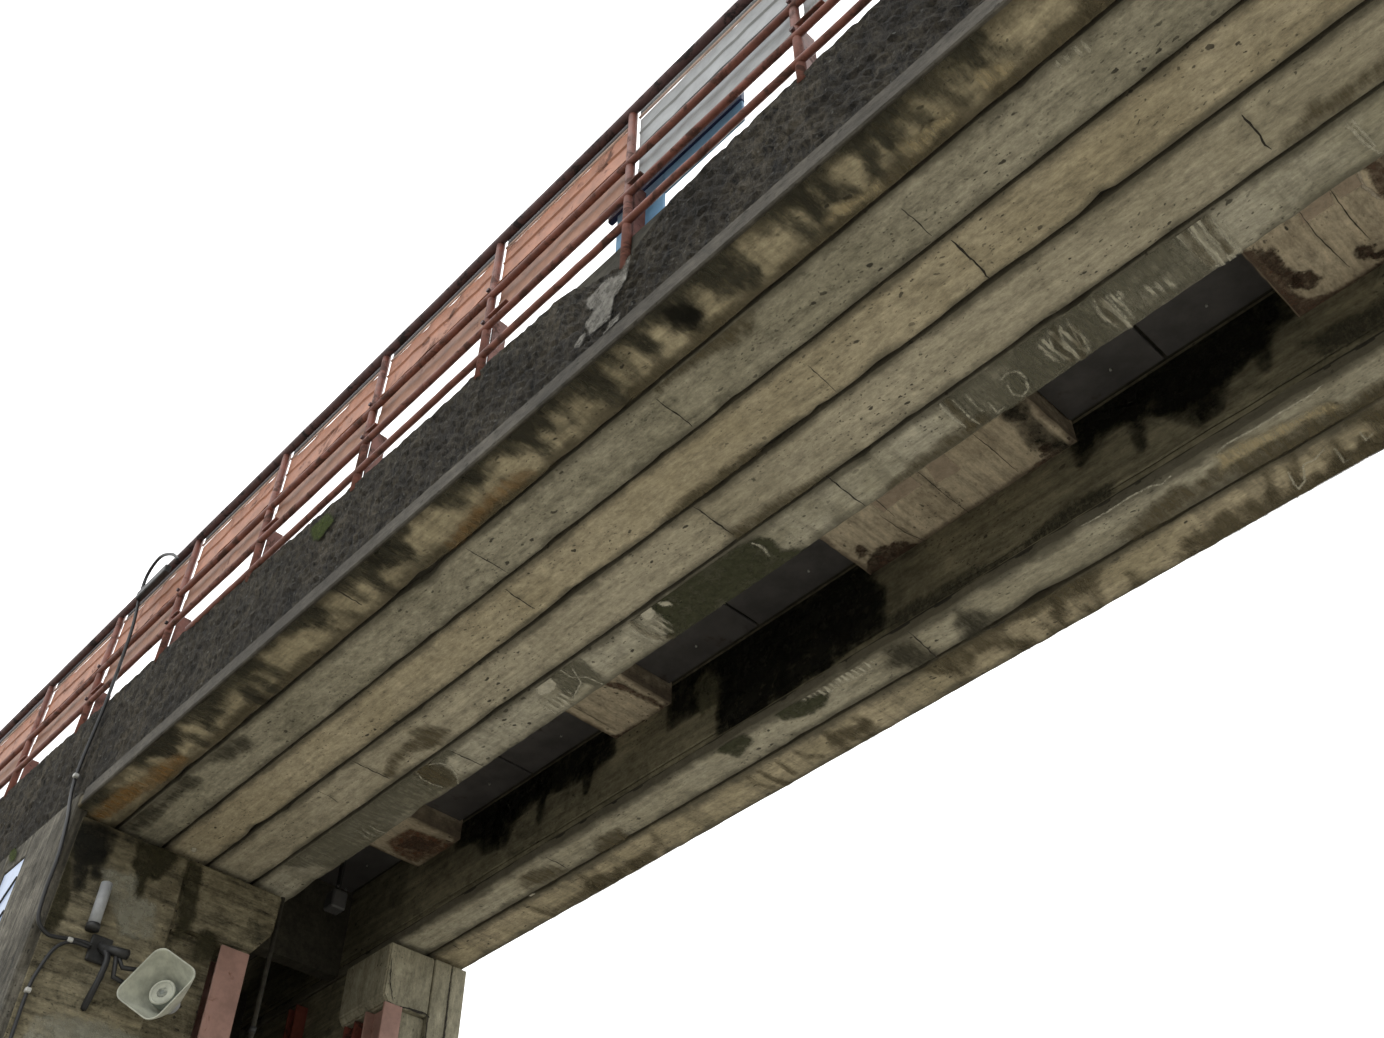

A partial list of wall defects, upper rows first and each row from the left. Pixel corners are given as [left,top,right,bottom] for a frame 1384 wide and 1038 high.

crack [1242,115,1271,149]
damp [433,245,761,508]
damp [890,219,1291,489]
damp [330,464,555,601]
damp [667,380,1384,758]
damp [134,605,325,767]
damp [44,777,217,960]
rust [389,829,451,862]
damp [457,732,615,854]
damp [759,764,794,787]